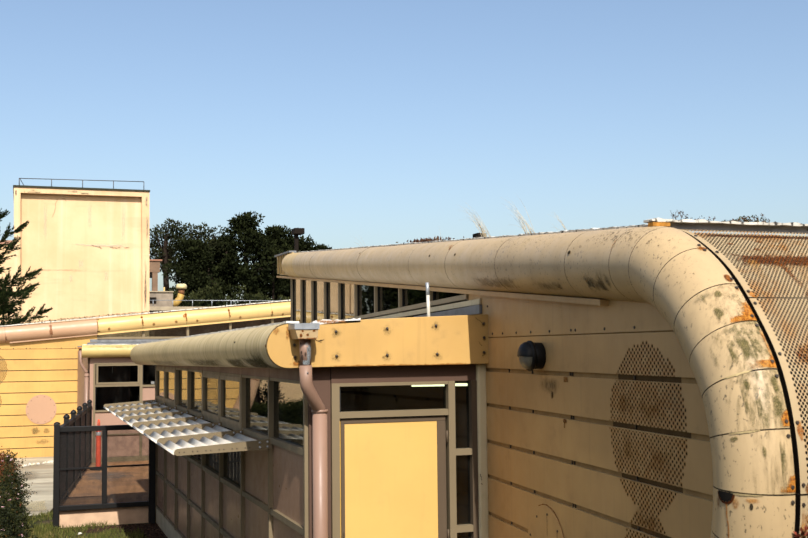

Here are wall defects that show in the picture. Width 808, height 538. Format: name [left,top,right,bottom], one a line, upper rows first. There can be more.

rust [705,234,808,296]
rust [731,291,759,323]
rust [756,330,777,368]
water stain [728,321,784,425]
rust [781,410,804,440]